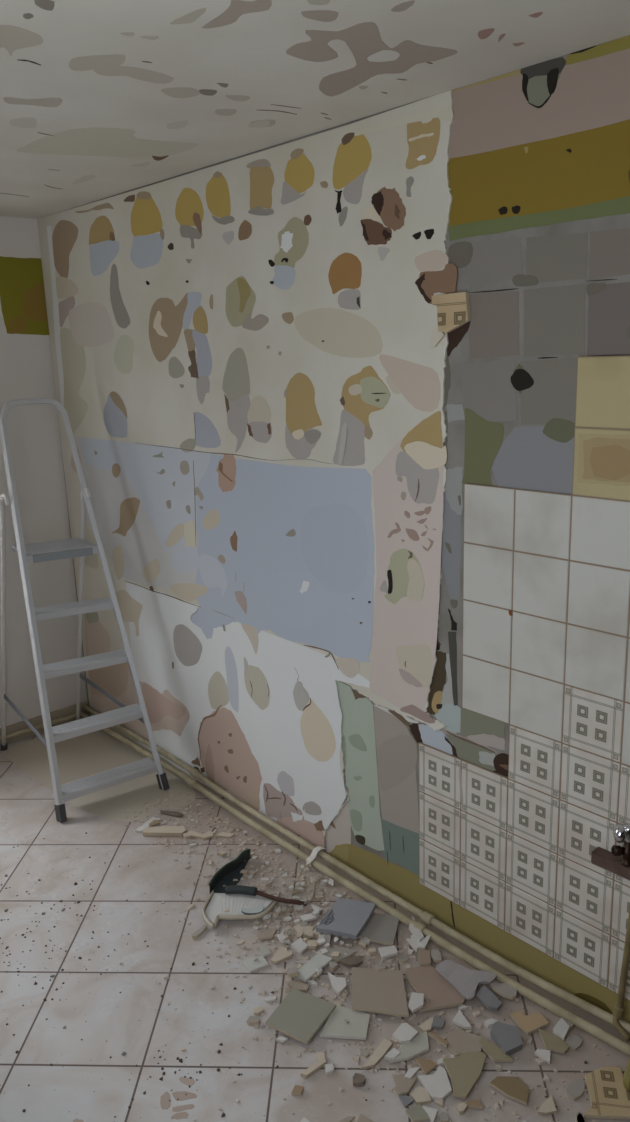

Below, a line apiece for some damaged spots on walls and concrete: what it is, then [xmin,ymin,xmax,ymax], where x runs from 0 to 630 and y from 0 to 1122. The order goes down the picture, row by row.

peeling [286,0,457,97]
spalling [520,57,566,106]
peeling [246,93,440,261]
peeling [52,158,234,329]
peeling [328,253,362,310]
spalling [415,263,458,305]
peeling [149,276,294,493]
peeling [284,373,322,460]
peeling [333,366,391,466]
peeling [380,411,452,604]
spalling [191,591,336,851]
peeling [374,629,446,743]